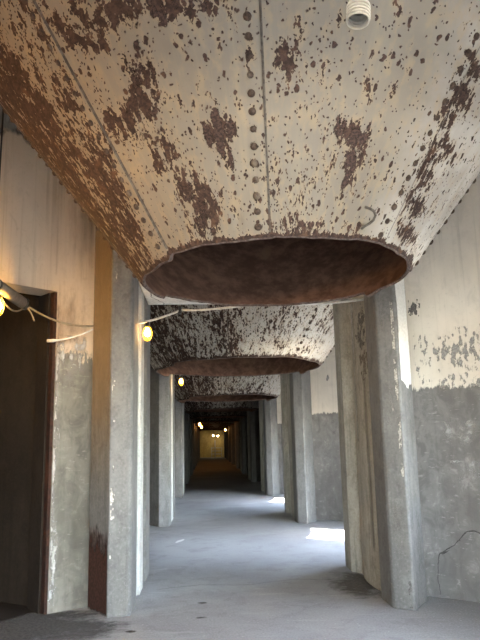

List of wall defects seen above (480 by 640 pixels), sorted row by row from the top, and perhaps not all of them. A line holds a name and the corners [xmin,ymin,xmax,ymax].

corrosion [146,0,167,27]
corrosion [126,40,153,123]
corrosion [202,107,234,171]
corrosion [333,114,372,196]
corrosion [400,64,480,246]
corrosion [178,181,216,237]
peeling [389,279,480,400]
corrosion [88,526,107,615]